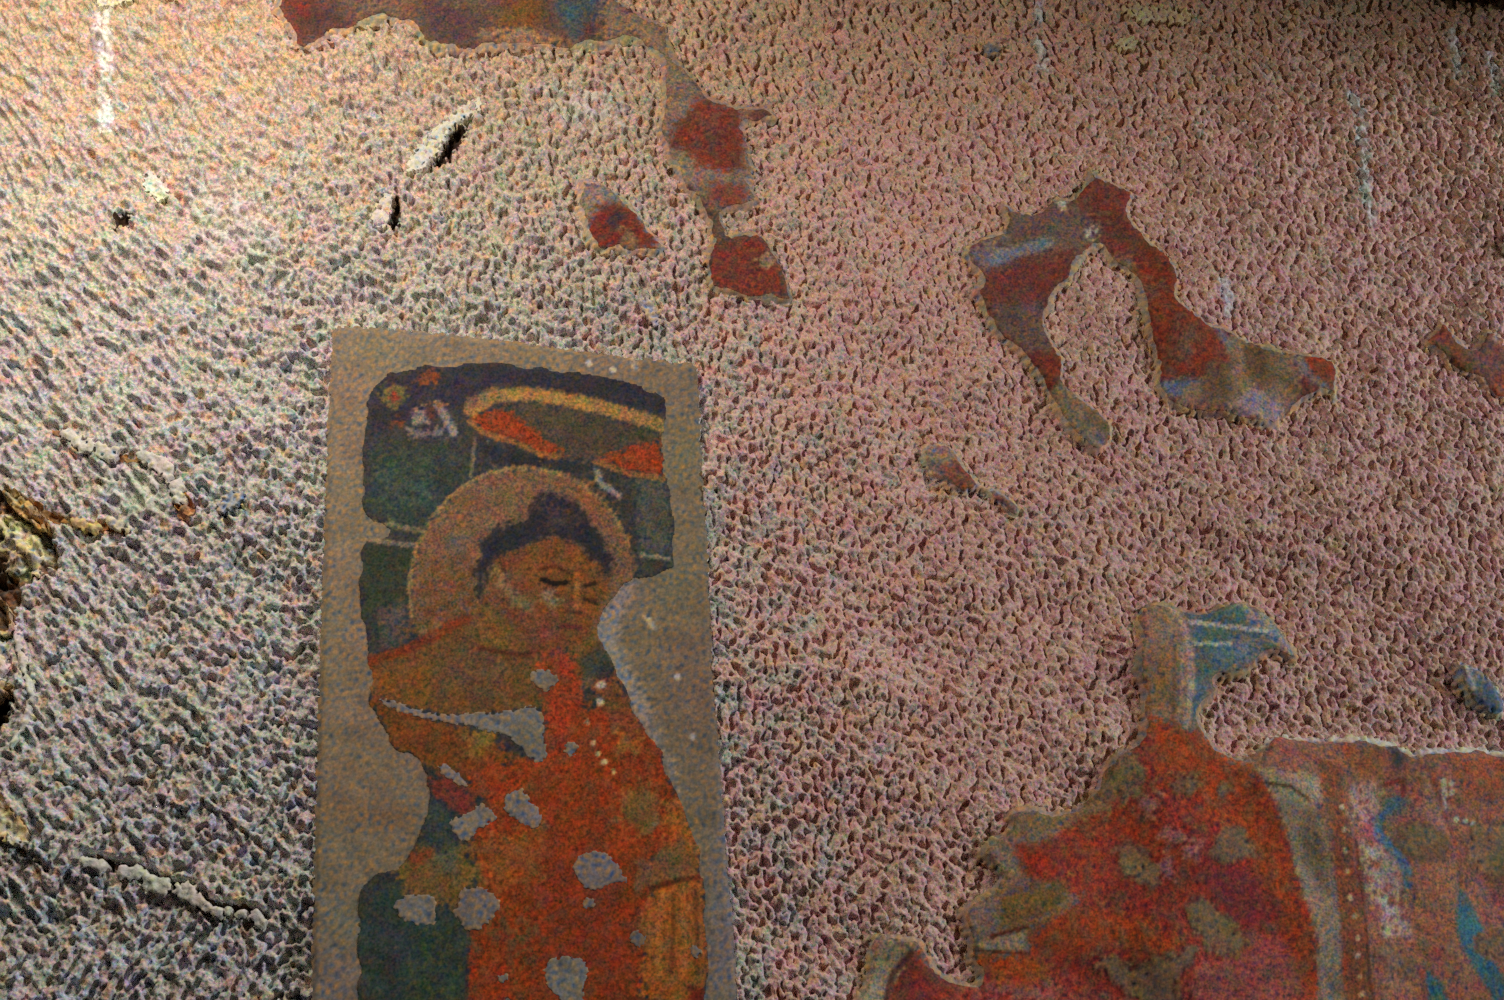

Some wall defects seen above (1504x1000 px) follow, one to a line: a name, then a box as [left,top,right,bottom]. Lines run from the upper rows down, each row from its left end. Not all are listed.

peeling [378,669,579,763]
peeling [437,763,468,787]
peeling [449,788,542,841]
peeling [572,851,627,909]
peeling [393,886,500,931]
peeling [629,930,646,948]
peeling [542,956,589,1000]